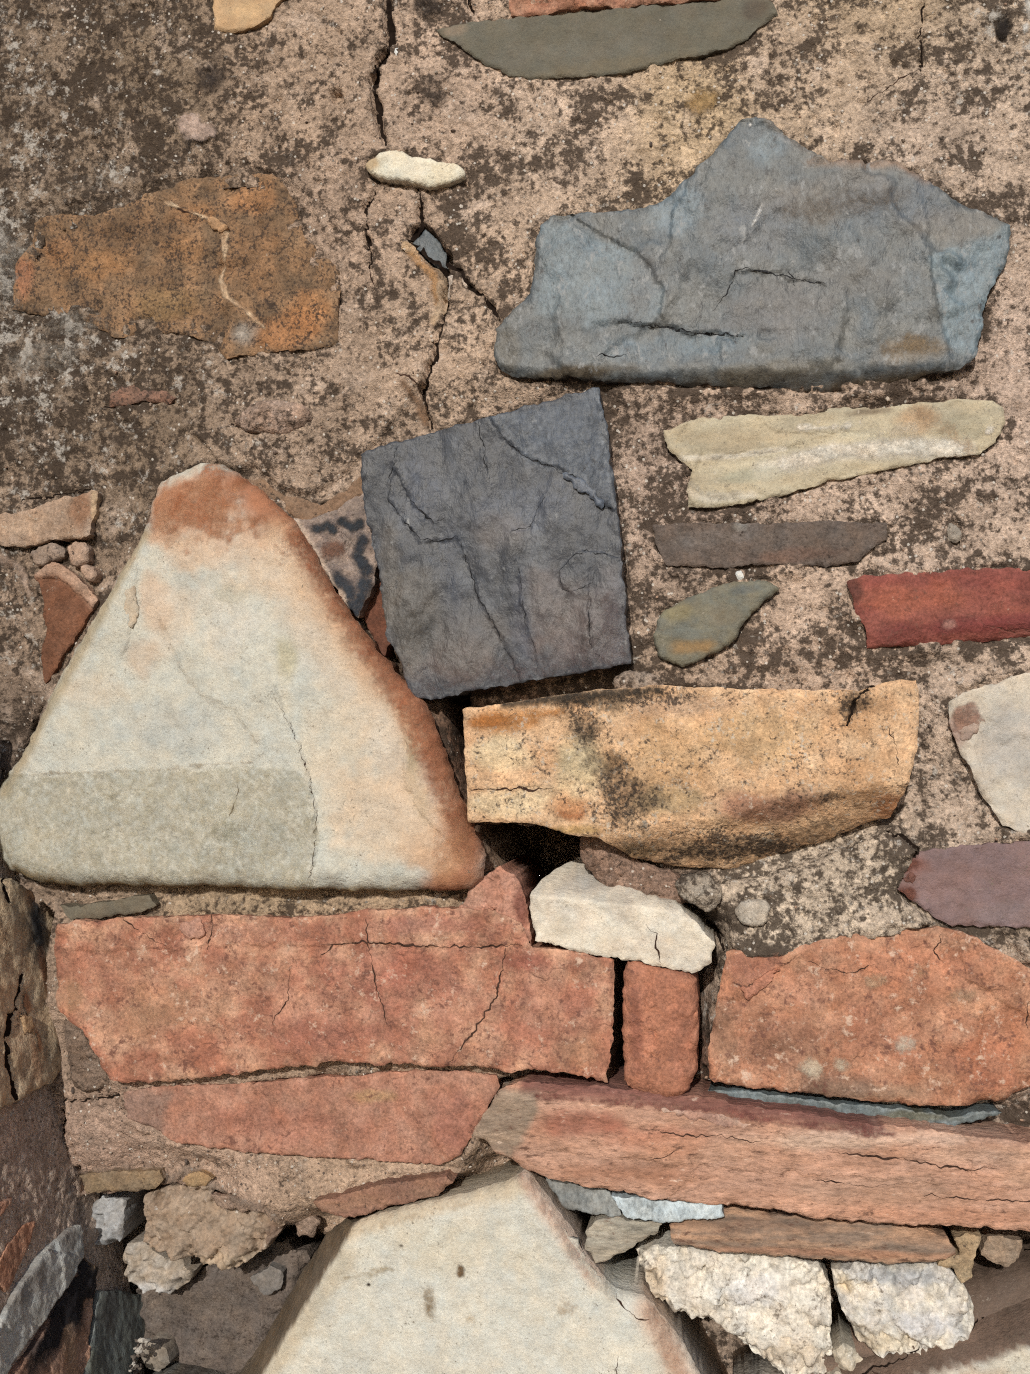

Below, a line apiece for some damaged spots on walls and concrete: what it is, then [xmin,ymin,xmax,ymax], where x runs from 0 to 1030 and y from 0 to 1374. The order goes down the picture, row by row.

crack [371,0,396,146]
crack [364,181,381,299]
crack [396,189,500,430]
crack [321,920,522,1062]